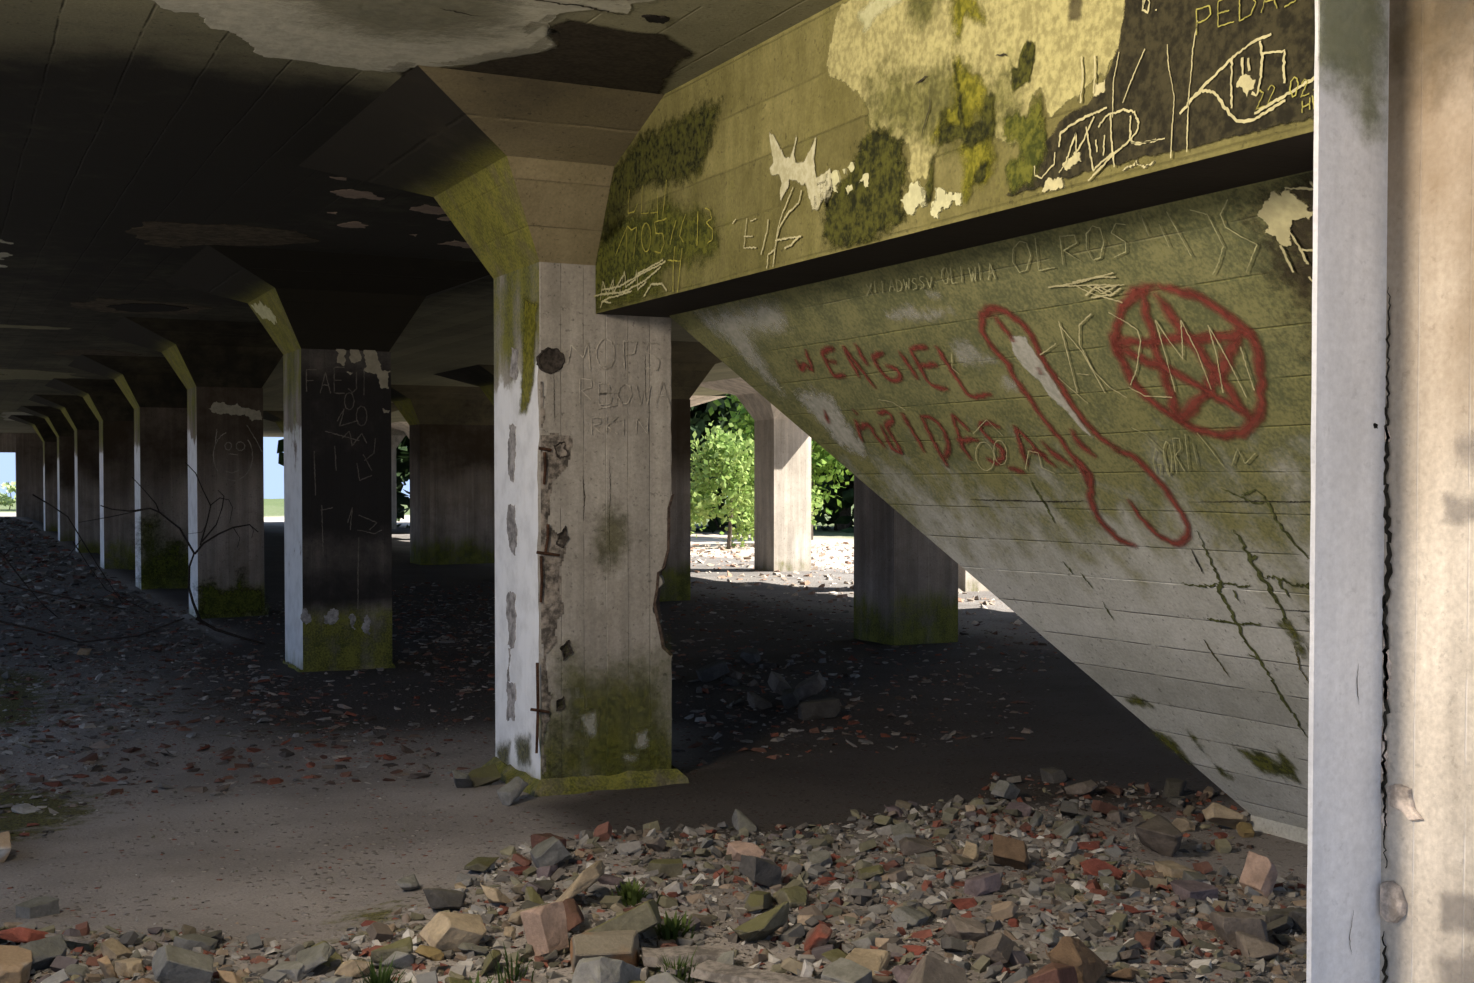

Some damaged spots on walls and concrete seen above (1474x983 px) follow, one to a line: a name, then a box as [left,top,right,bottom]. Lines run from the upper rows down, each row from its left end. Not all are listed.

peeling [153,0,670,72]
leakage [910,0,932,21]
leakage [951,0,985,37]
leakage [925,57,996,203]
peeling [826,0,1125,219]
peeling [1122,159,1156,171]
crack [971,483,1084,523]
spalling [452,347,573,806]
crack [1183,488,1311,735]
crack [1357,287,1393,868]
crack [1349,911,1388,983]